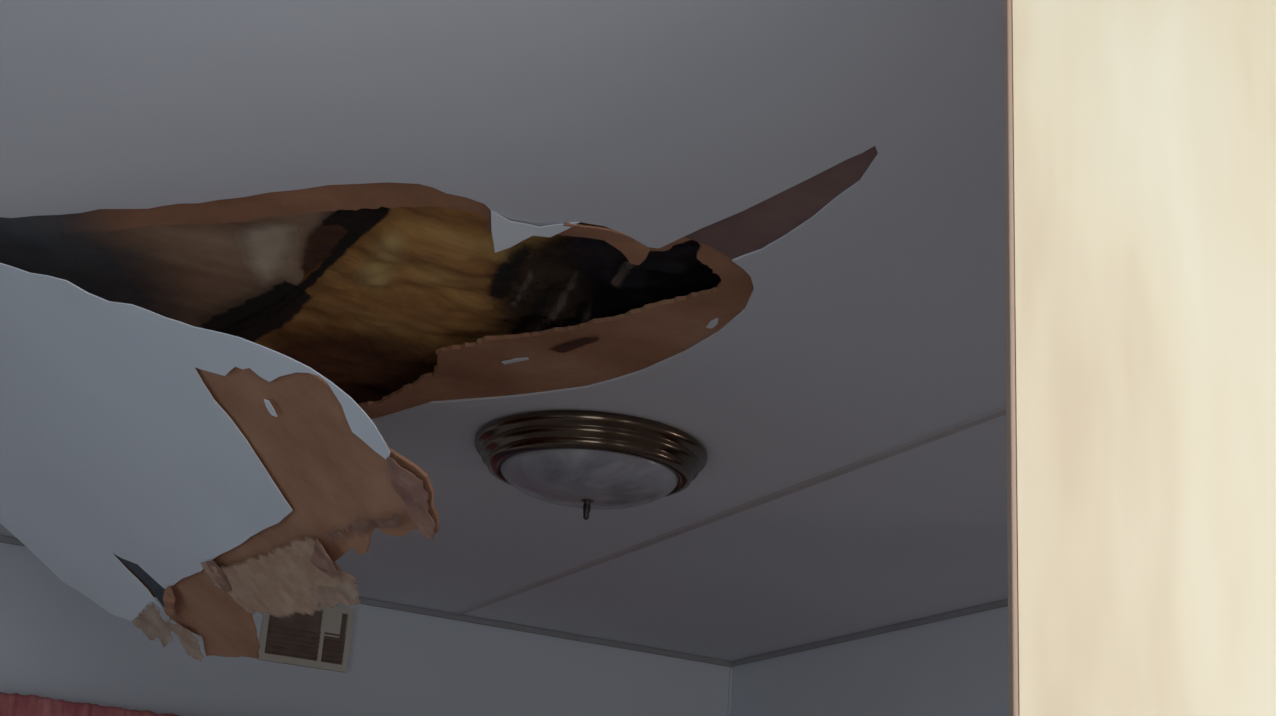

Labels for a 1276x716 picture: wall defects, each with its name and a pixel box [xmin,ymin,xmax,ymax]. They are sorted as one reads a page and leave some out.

leakage [0,213,169,318]
leakage [243,224,294,280]
peeling [491,211,650,265]
leakage [489,236,721,353]
peeling [684,146,878,259]
leakage [271,333,437,404]
peeling [264,399,277,417]